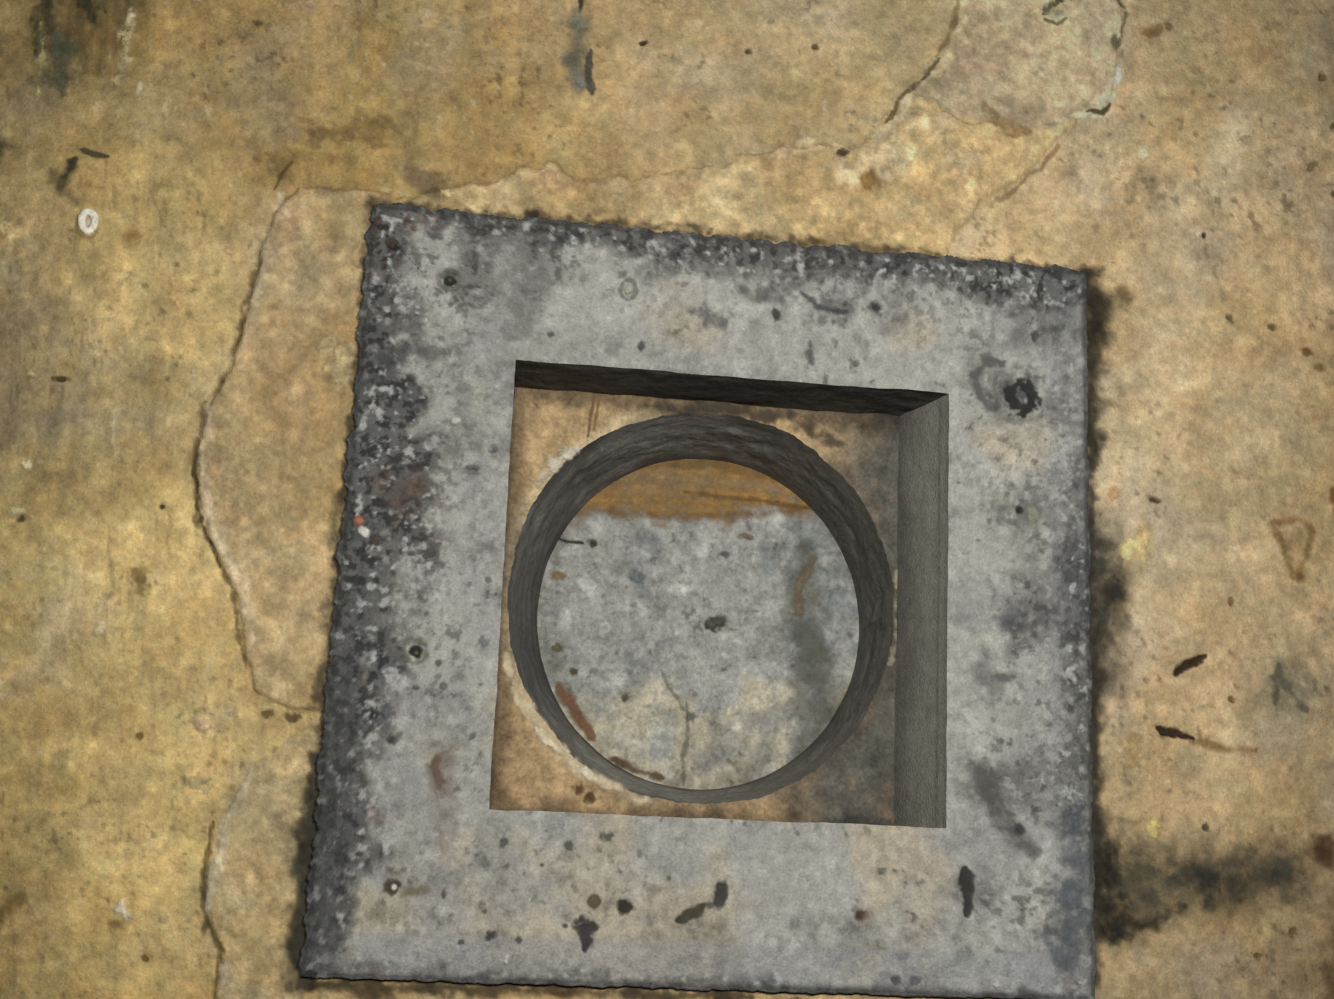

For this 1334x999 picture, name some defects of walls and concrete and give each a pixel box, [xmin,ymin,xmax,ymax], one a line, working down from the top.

crack [1112,0,1126,48]
crack [886,0,960,123]
crack [1086,103,1111,115]
crack [999,145,1060,202]
crack [587,396,600,437]
crack [192,261,261,664]
corrosion [577,459,810,519]
crack [559,537,584,545]
corrosion [556,683,595,741]
corrosion [611,756,665,780]
water stain [1091,660,1168,944]
crack [200,821,224,996]